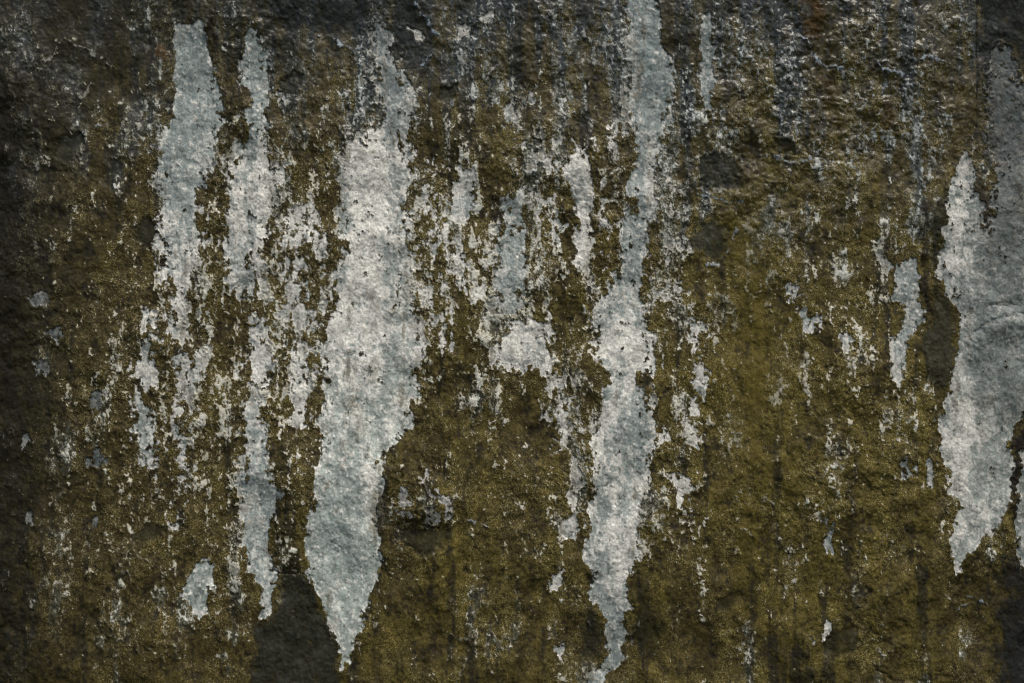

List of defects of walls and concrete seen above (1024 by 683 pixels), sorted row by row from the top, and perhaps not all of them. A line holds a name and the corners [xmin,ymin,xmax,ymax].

peeling [407,26,425,41]
peeling [456,10,494,40]
peeling [501,98,517,128]
peeling [271,194,331,430]
peeling [412,118,629,541]
peeling [654,280,712,450]
peeling [134,345,211,549]
spalling [395,468,453,557]
peeling [666,472,697,524]
peeling [900,455,936,489]
peeling [180,558,217,620]
peeling [548,567,565,592]